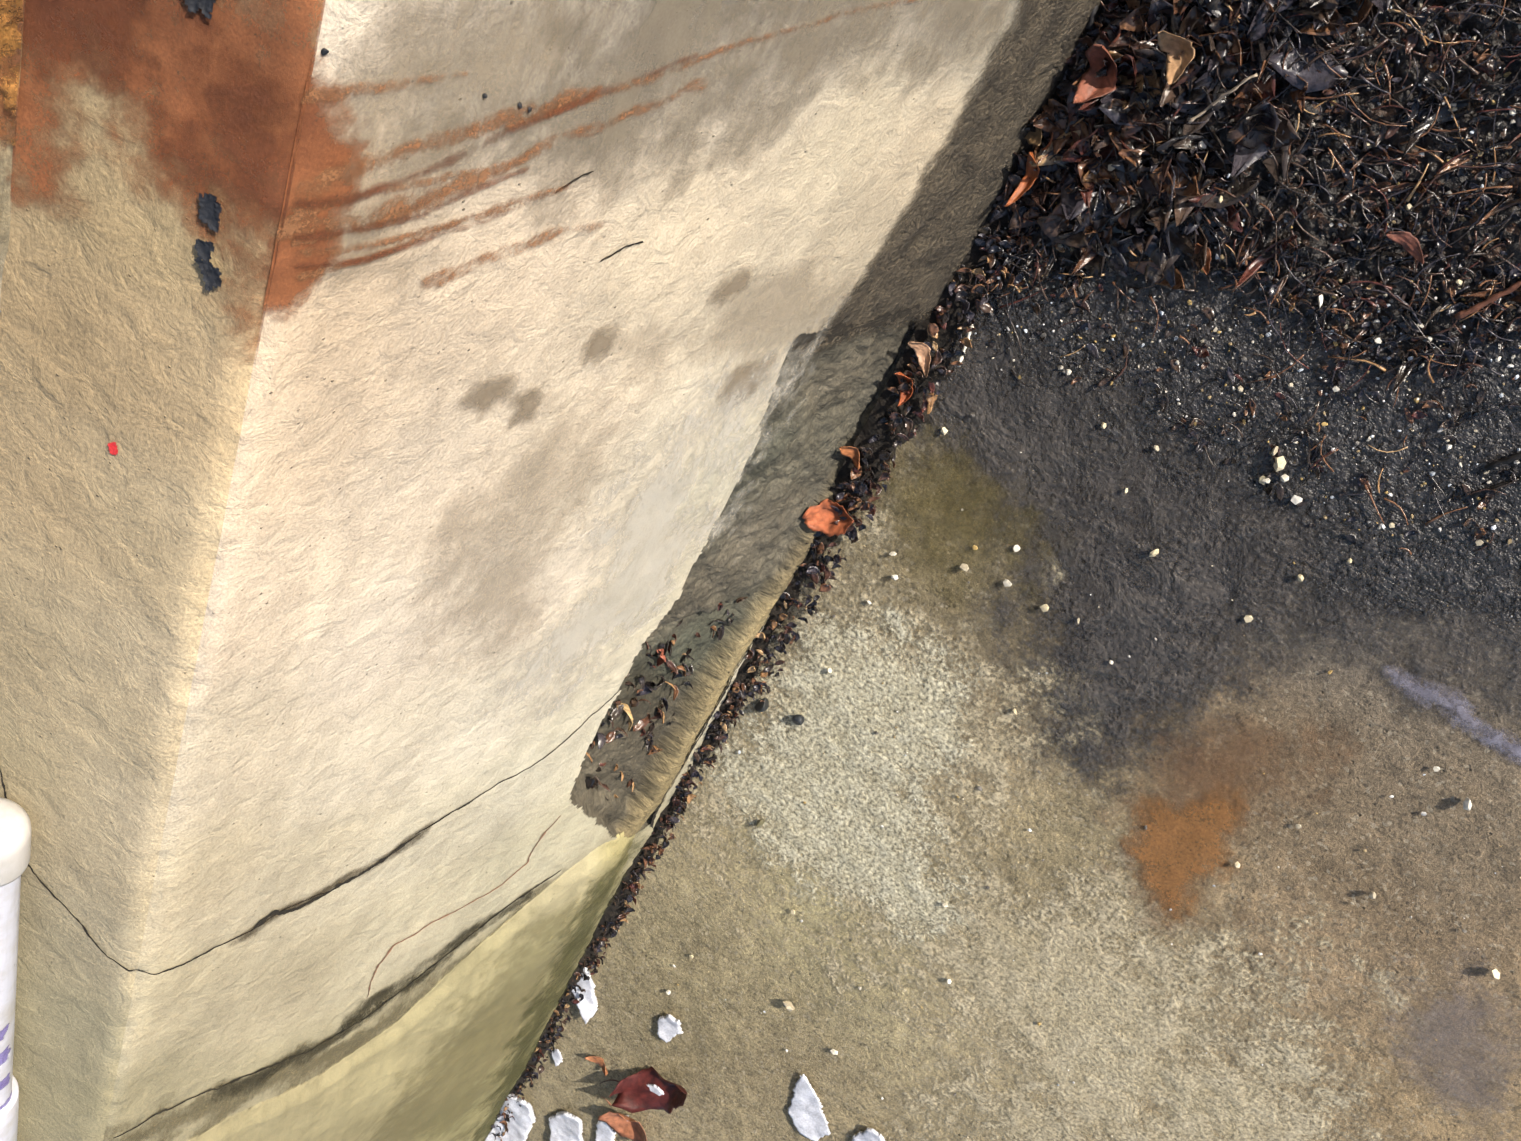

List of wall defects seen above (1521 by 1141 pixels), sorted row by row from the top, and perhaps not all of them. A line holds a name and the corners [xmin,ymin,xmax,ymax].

rust [0,0,659,346]
rust [574,29,791,137]
crack [28,689,621,975]
damp [667,249,1521,1141]